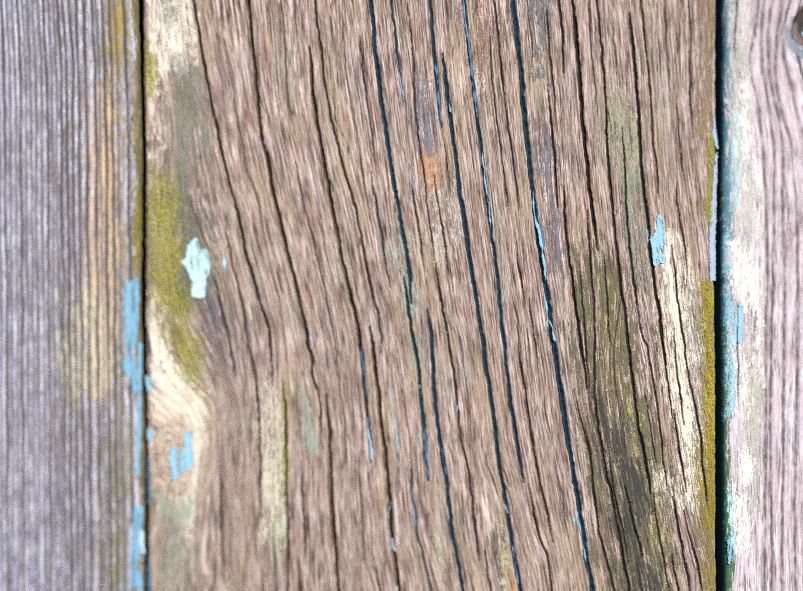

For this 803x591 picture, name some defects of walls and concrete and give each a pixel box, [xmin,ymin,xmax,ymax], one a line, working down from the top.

water stain [0,0,146,591]
peeling [123,277,154,591]
peeling [169,432,193,481]
peeling [181,238,211,298]
water stain [149,52,249,387]
crack [188,0,707,591]
water stain [584,376,677,591]
peeling [646,214,666,267]
water stain [679,284,708,457]
peeling [709,0,744,422]
peeling [724,486,739,564]